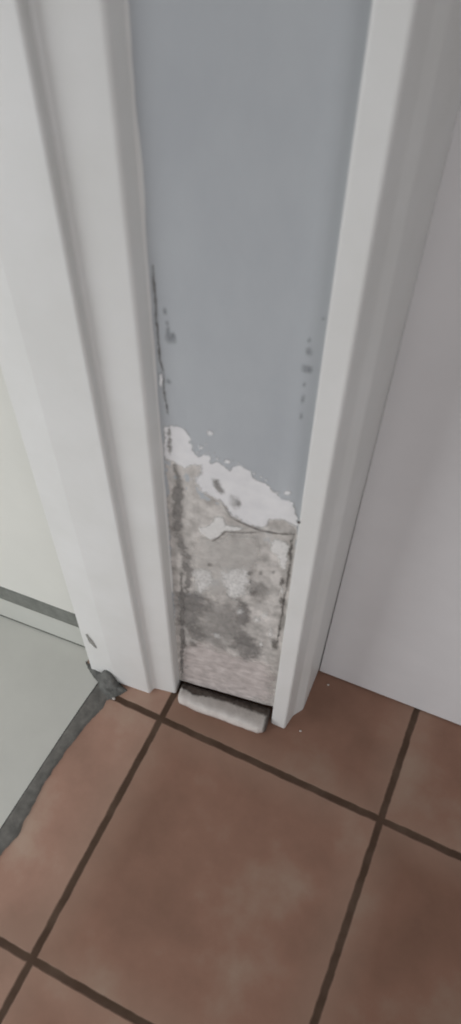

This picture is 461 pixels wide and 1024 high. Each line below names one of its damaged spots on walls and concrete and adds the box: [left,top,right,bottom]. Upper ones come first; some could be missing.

damp [172,465,205,675]
flaking render [163,425,298,706]
damp [235,602,259,658]